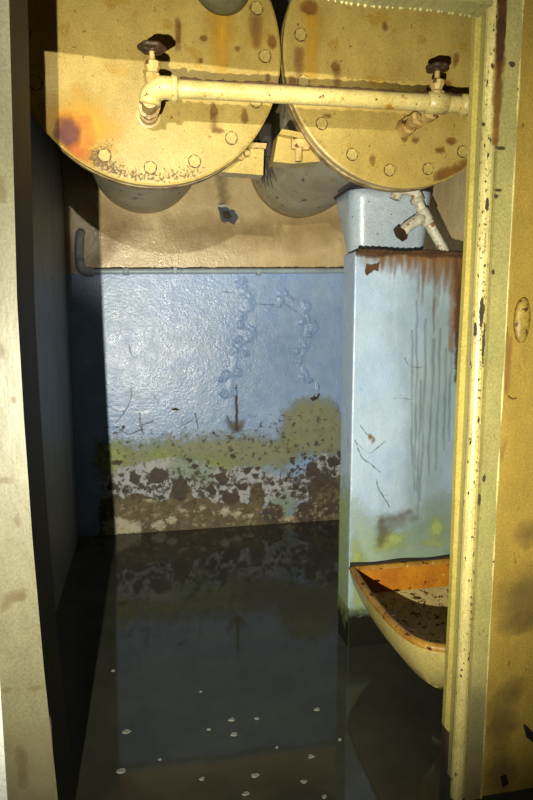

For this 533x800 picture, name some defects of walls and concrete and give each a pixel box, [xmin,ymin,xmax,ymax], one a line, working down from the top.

rust [492,0,507,145]
spalling [216,203,241,224]
rust [355,248,463,381]
spalling [98,451,341,536]